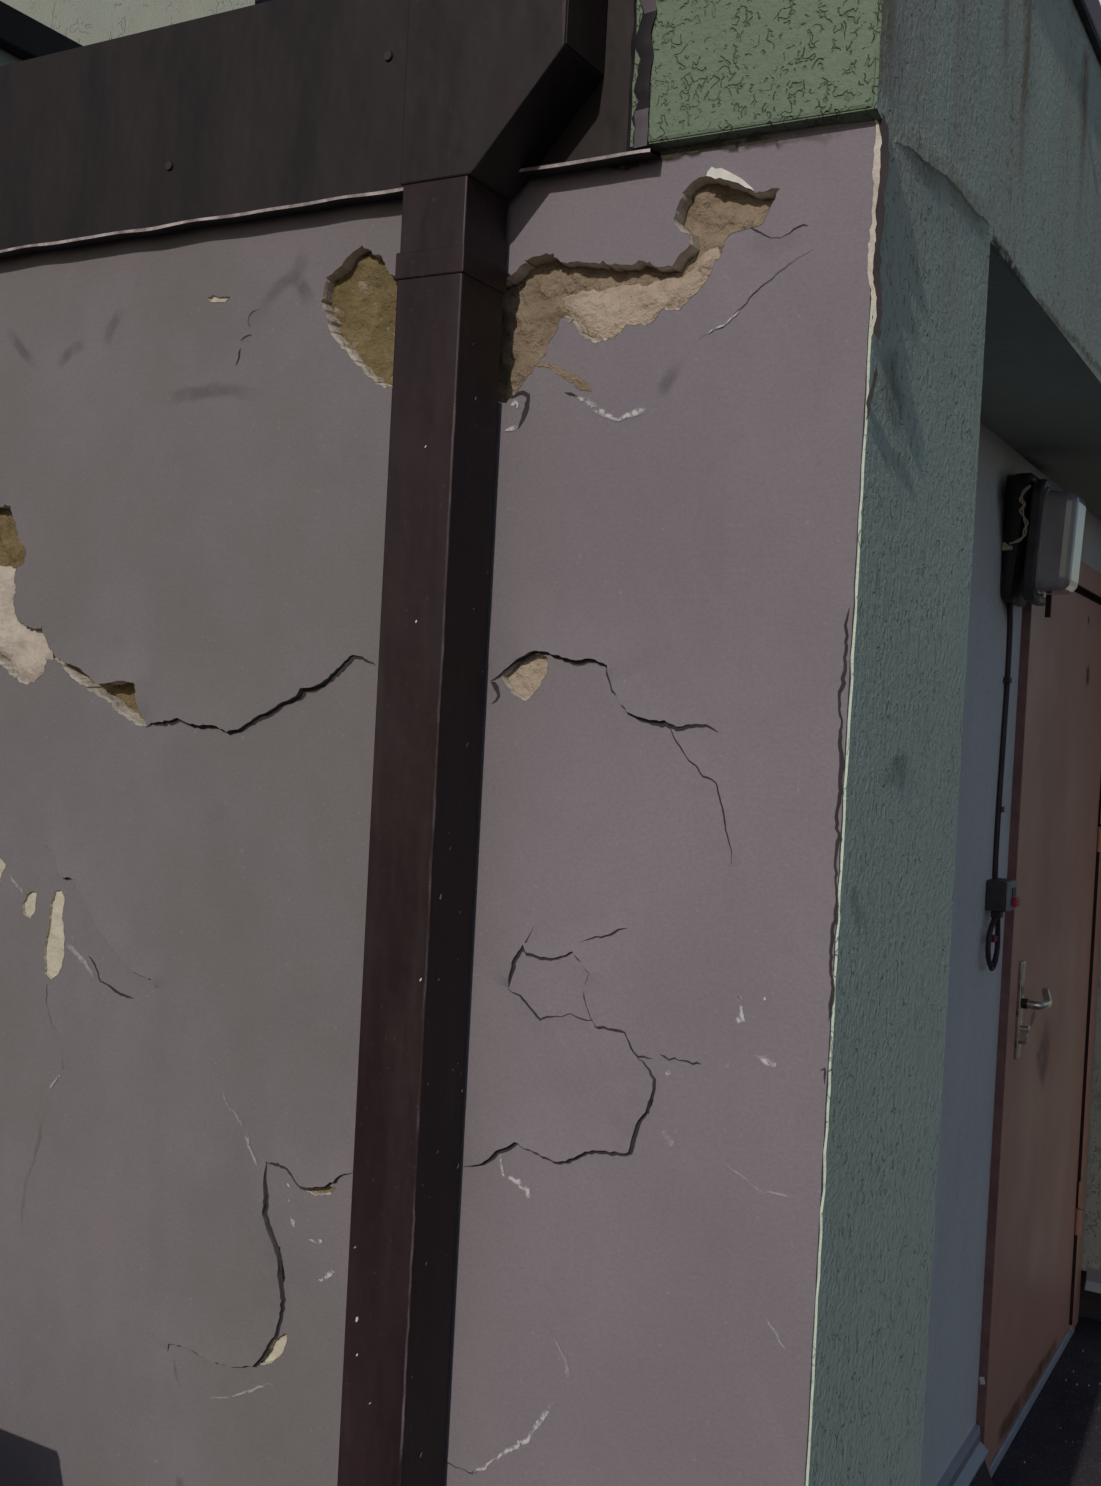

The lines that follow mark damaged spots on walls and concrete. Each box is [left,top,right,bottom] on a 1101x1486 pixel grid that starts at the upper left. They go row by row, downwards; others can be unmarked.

flaking render [321,245,397,388]
flaking render [498,167,780,431]
crack [866,113,991,420]
flaking render [0,505,158,726]
crack [485,584,748,868]
crack [460,913,700,1167]
crack [141,1135,353,1398]